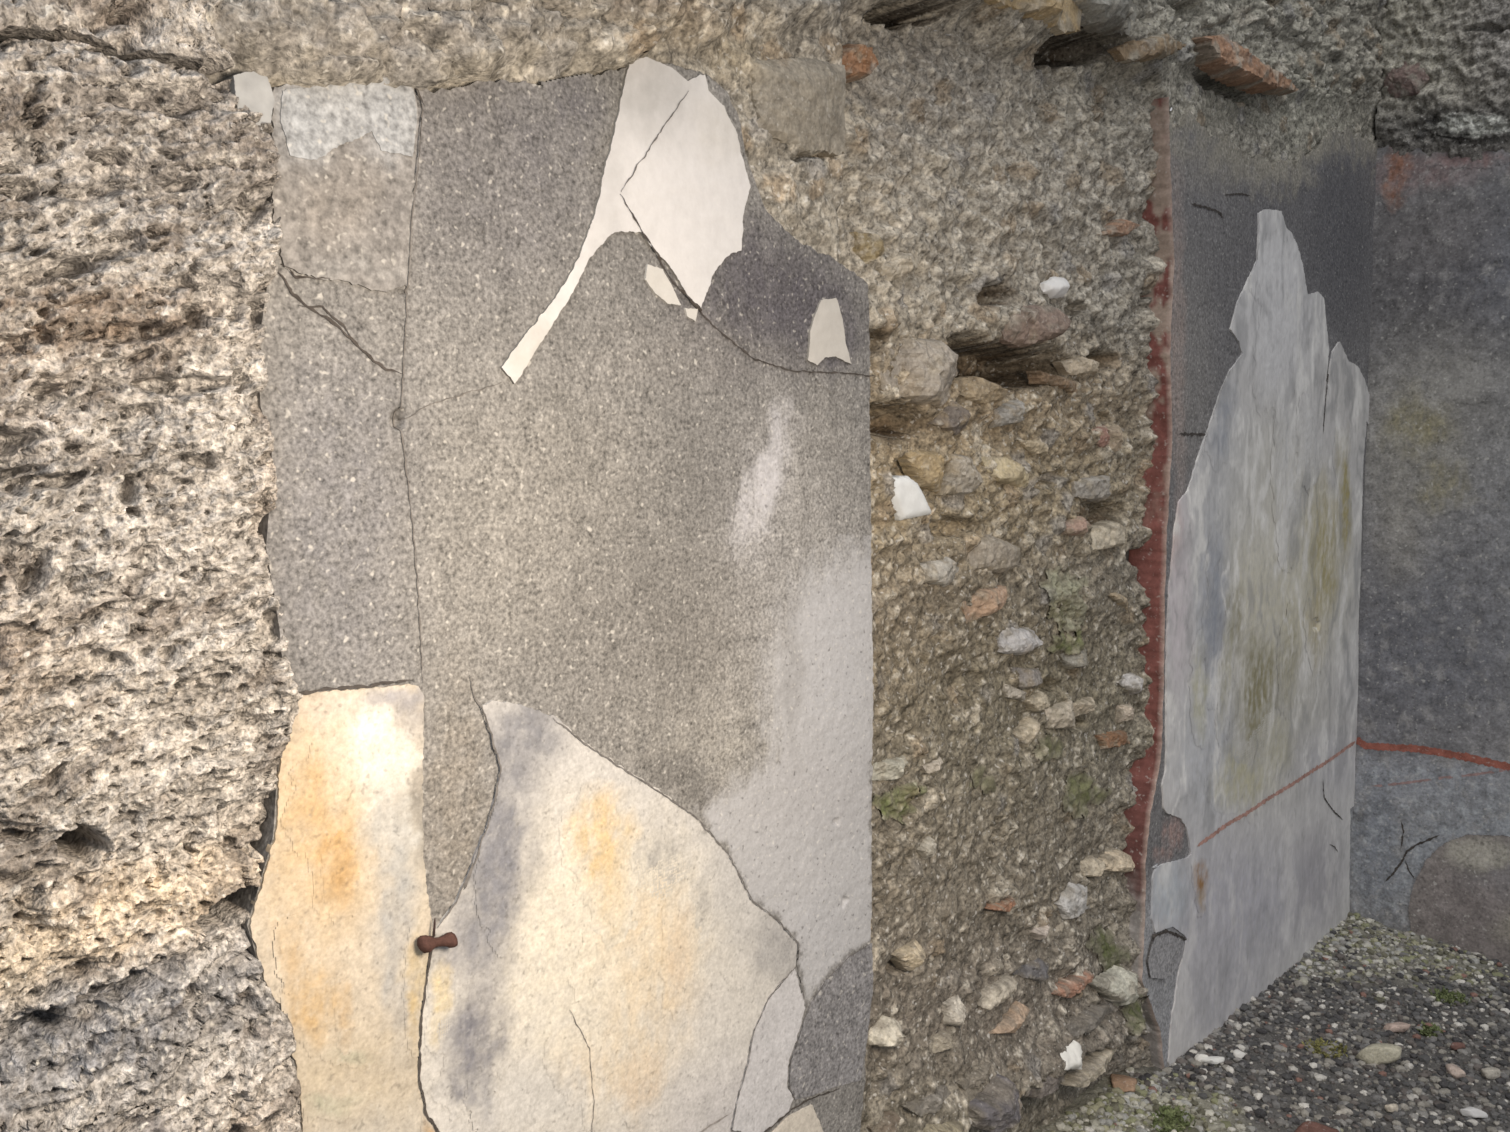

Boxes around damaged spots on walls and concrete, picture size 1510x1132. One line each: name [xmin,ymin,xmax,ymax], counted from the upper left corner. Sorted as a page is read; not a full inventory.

flaking render [500,57,751,384]
flaking render [806,298,851,365]
crack [418,675,502,1132]
crack [554,719,870,1132]
spalling [1146,933,1186,979]
crack [1386,822,1439,881]